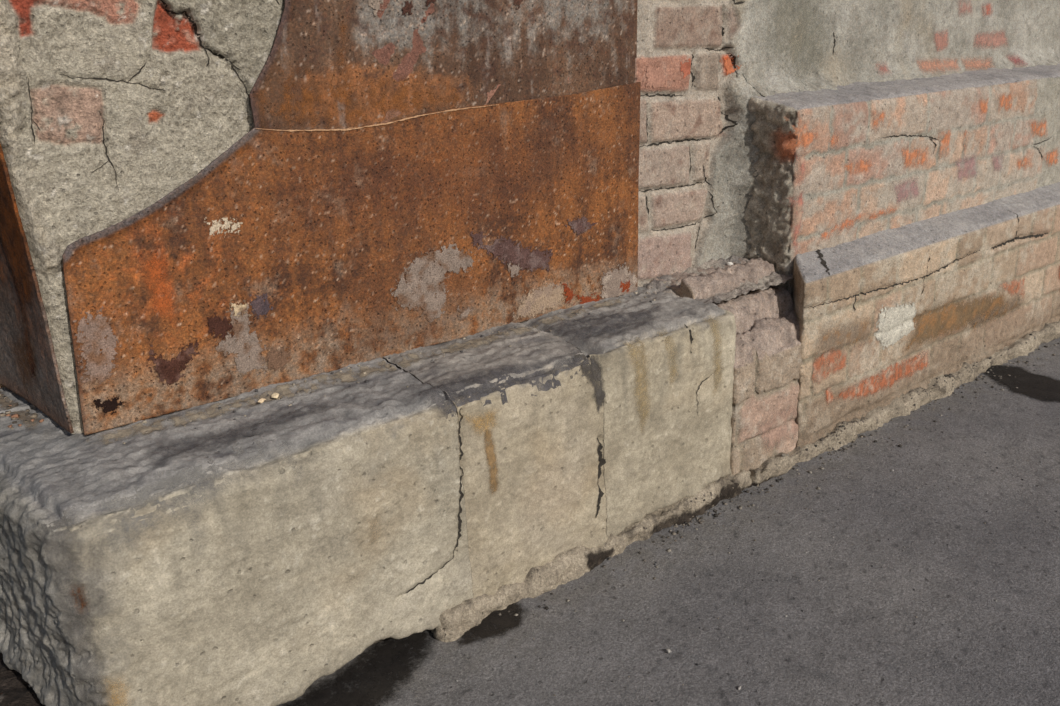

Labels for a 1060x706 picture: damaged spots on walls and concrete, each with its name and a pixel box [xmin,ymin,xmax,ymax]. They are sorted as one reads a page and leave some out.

crack [160,0,249,96]
rust [398,0,436,19]
peeling [206,217,243,237]
rust [142,311,234,391]
peeling [390,243,476,325]
peeling [507,261,523,278]
leakage [433,297,651,355]
rust [562,279,600,305]
leakage [103,353,419,444]
leakage [425,357,588,492]
crack [404,409,464,594]
crack [596,438,606,518]